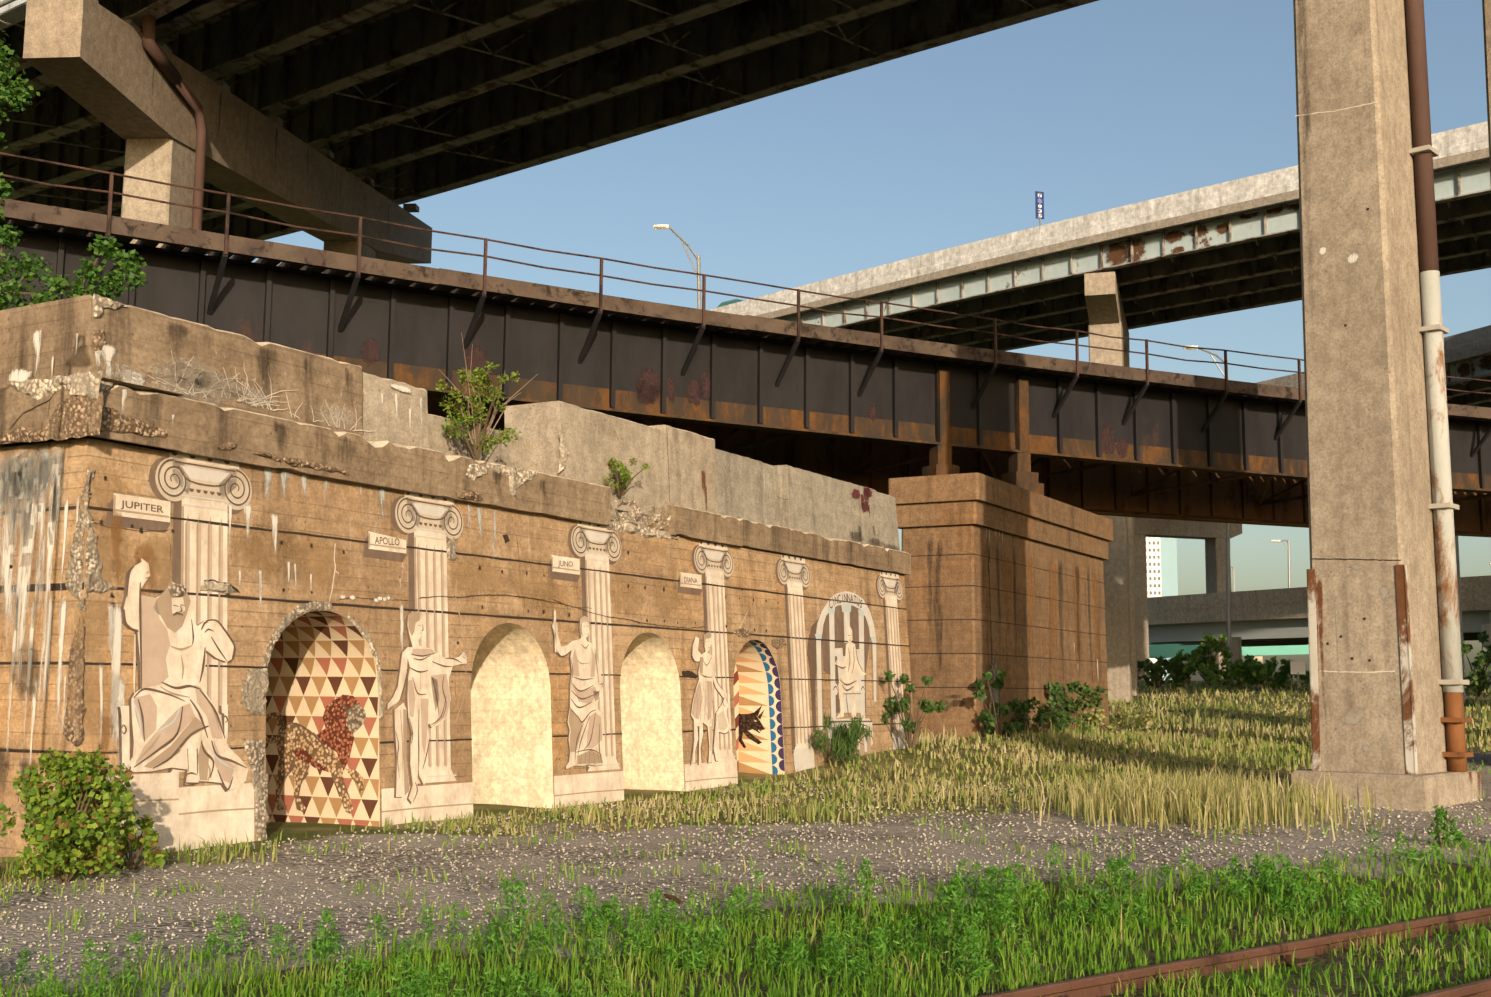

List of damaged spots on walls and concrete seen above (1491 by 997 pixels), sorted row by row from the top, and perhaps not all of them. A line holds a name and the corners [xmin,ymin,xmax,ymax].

rust [1106,238,1146,266]
rust [1166,203,1299,253]
spalling [0,294,167,443]
spalling [605,492,679,540]
water stain [0,448,80,781]
rust [1315,578,1324,695]